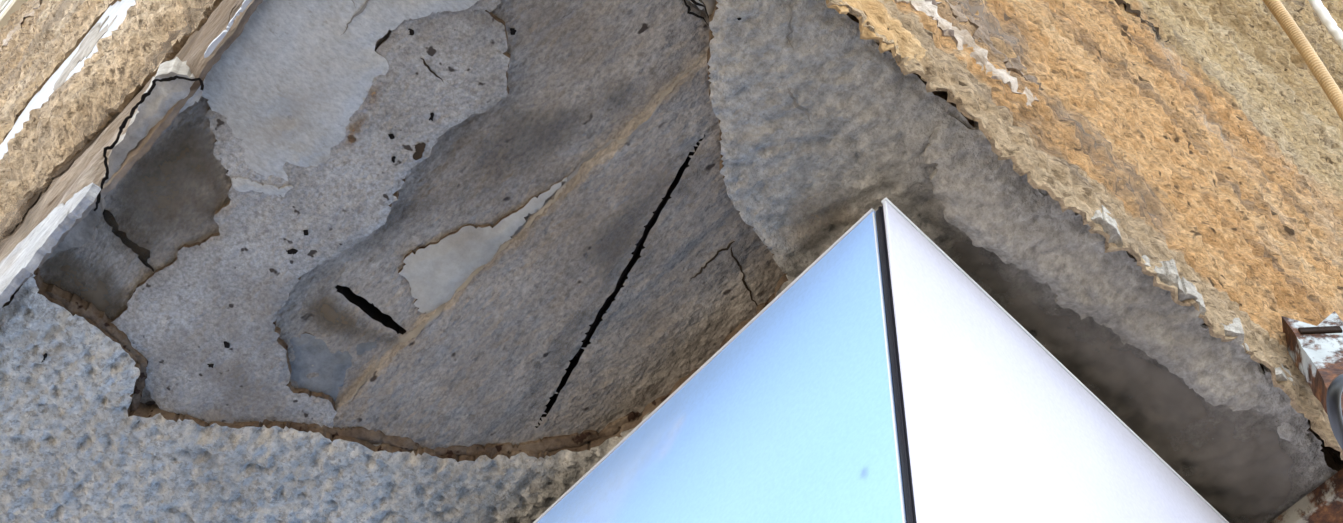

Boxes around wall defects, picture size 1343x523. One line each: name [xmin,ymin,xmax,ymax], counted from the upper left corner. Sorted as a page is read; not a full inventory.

crack [757,0,793,48]
peeling [826,0,1042,106]
crack [0,75,204,272]
spalling [0,0,784,457]